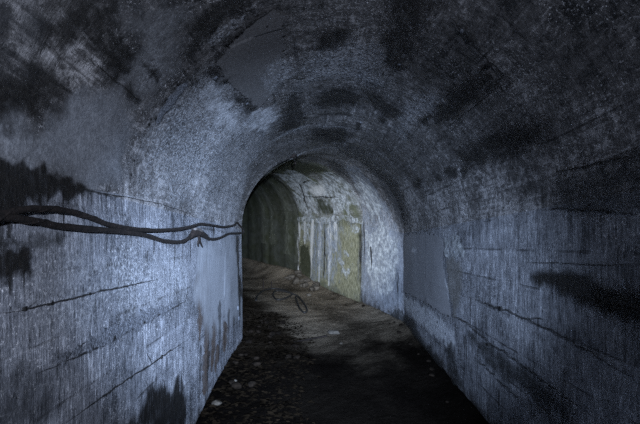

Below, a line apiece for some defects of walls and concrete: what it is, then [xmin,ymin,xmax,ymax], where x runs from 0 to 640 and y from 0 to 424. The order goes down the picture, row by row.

leakage [38,0,177,102]
leakage [0,60,130,244]
leakage [0,222,30,295]
crack [9,279,157,313]
leakage [128,376,186,424]
corrosion [198,299,228,395]
leakage [280,150,568,424]
crack [452,314,592,422]
crack [476,300,639,384]